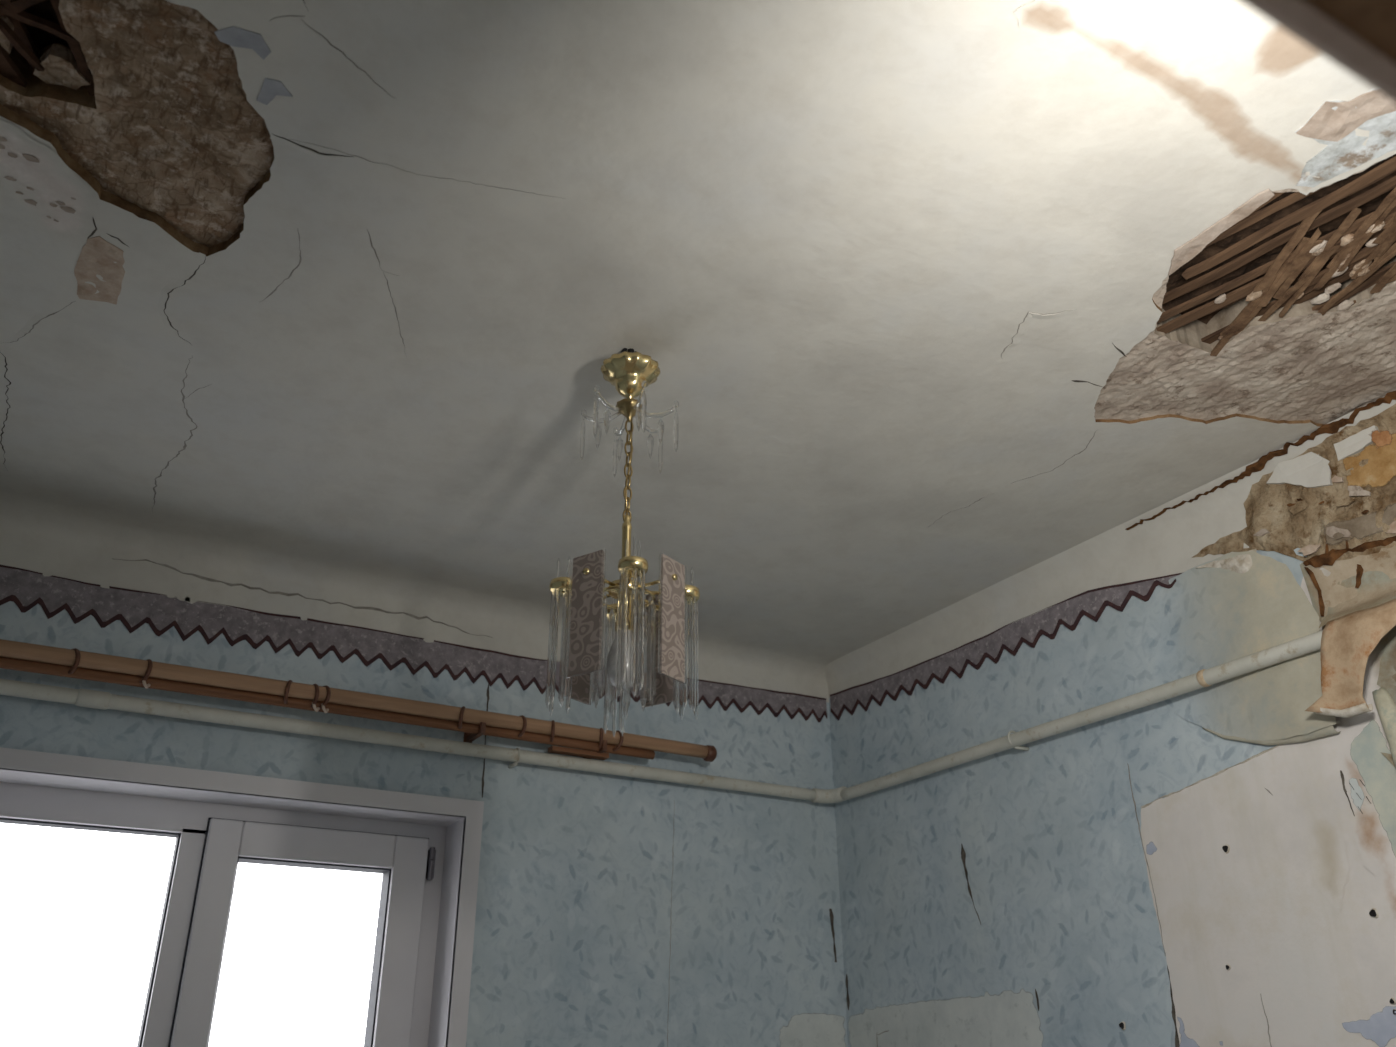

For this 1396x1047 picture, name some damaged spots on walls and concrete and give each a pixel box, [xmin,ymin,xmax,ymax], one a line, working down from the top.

flaking render [0,0,274,305]
crack [270,0,396,99]
crack [367,230,407,356]
water stain [1013,0,1324,195]
peeling [1152,89,1396,353]
crack [0,298,76,469]
crack [152,252,209,508]
peeling [1267,425,1379,514]
crack [115,559,492,638]
flaking render [1297,518,1396,630]
water stain [1363,626,1396,703]
peeling [1141,686,1396,1047]